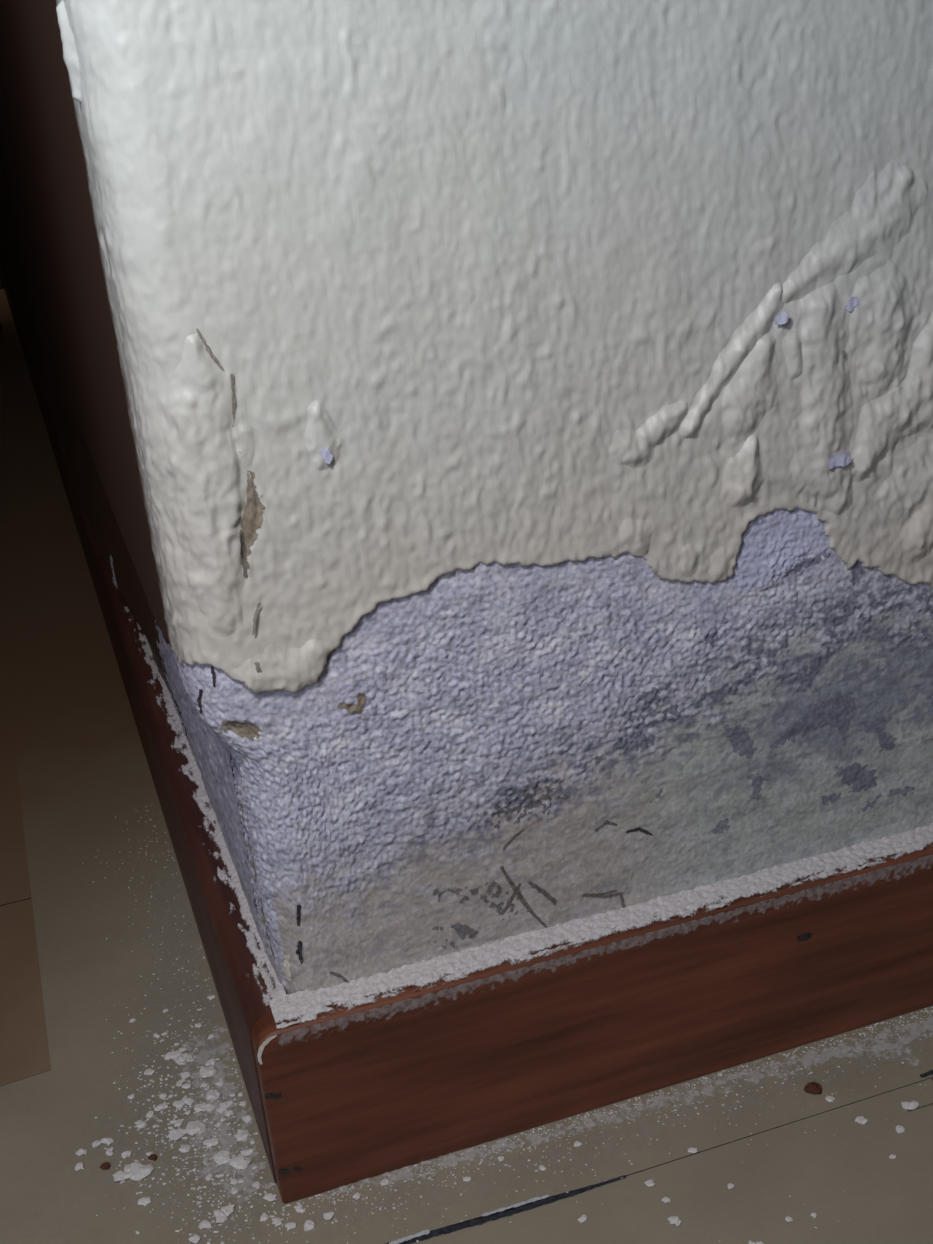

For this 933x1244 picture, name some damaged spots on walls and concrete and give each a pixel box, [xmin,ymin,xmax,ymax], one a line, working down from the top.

flaking render [153,509,933,994]